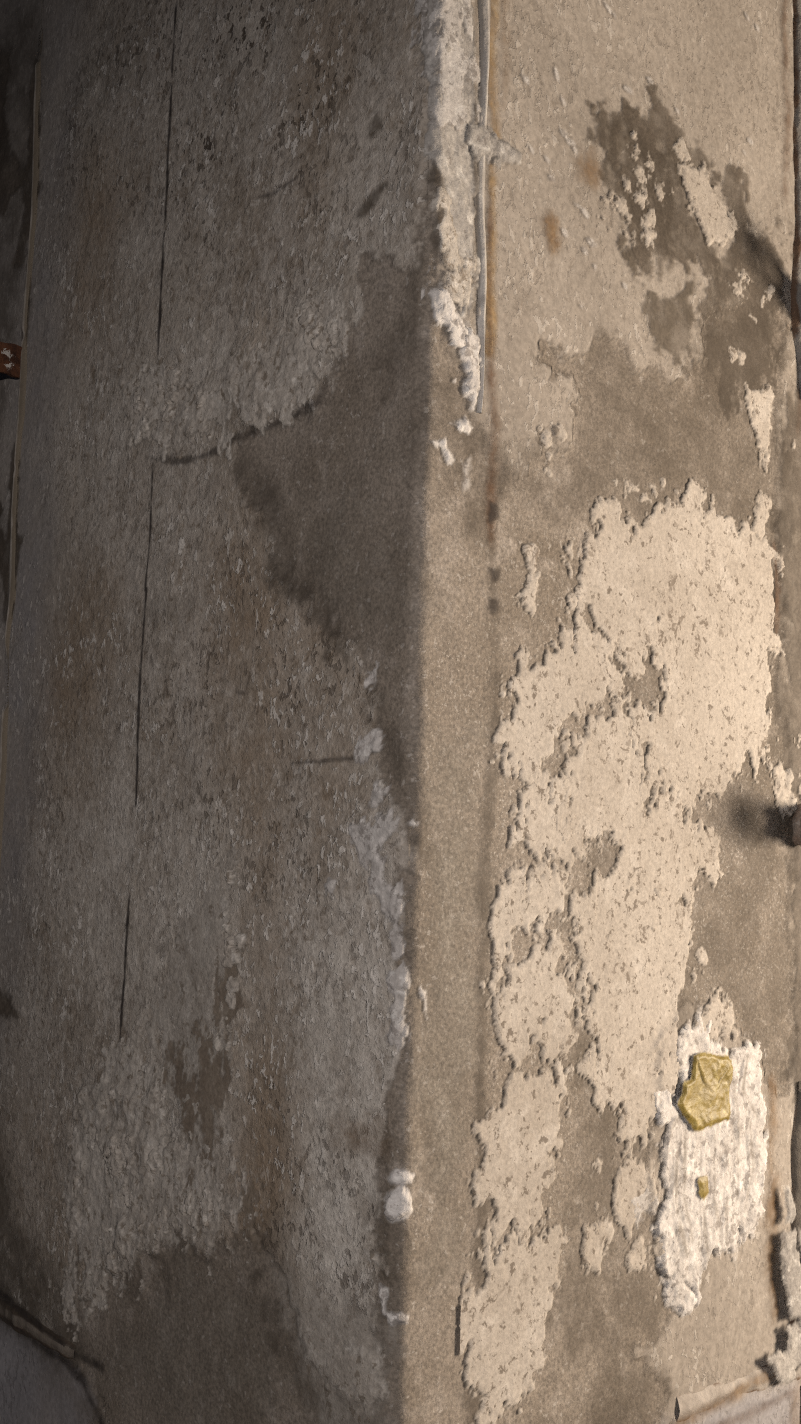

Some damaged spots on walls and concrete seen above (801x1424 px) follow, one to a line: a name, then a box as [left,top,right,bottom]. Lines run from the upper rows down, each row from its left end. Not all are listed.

crack [157,6,176,355]
peeling [677,161,738,248]
crack [119,899,129,1040]
crack [135,425,254,806]
leakage [354,728,382,764]
leakage [364,661,378,690]
leakage [348,782,428,1050]
spalling [63,196,801,1424]
leakage [587,85,801,1093]
efflorescence [631,1007,769,1317]
efflorescence [379,1283,409,1326]